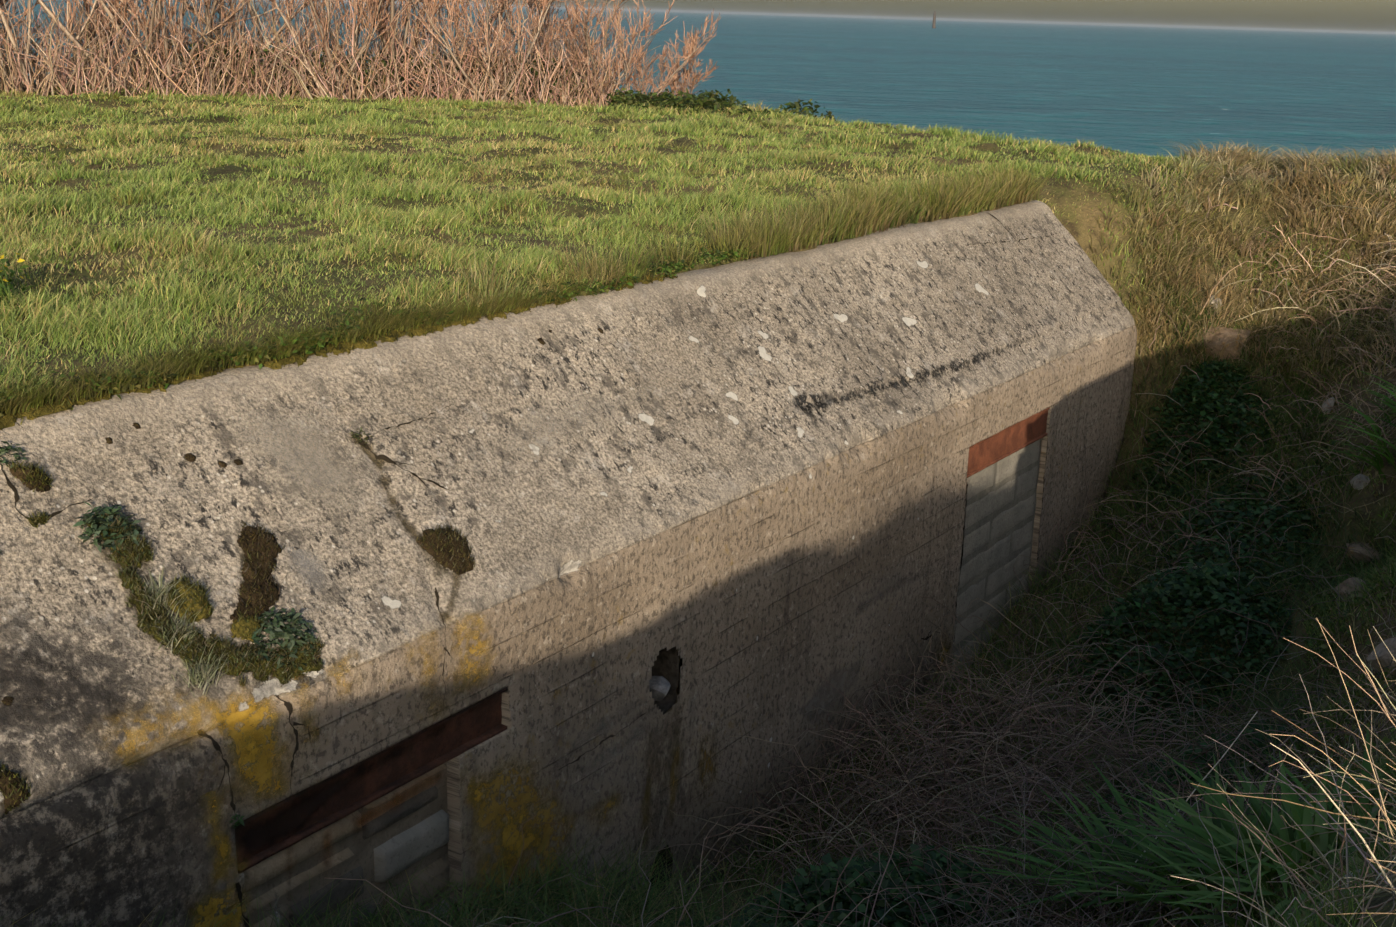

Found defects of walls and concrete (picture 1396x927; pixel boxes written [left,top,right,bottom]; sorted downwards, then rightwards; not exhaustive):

crack [358,406,449,490]
spalling [652,646,679,715]
crack [197,729,236,813]
crack [275,695,311,794]
crack [236,882,250,927]